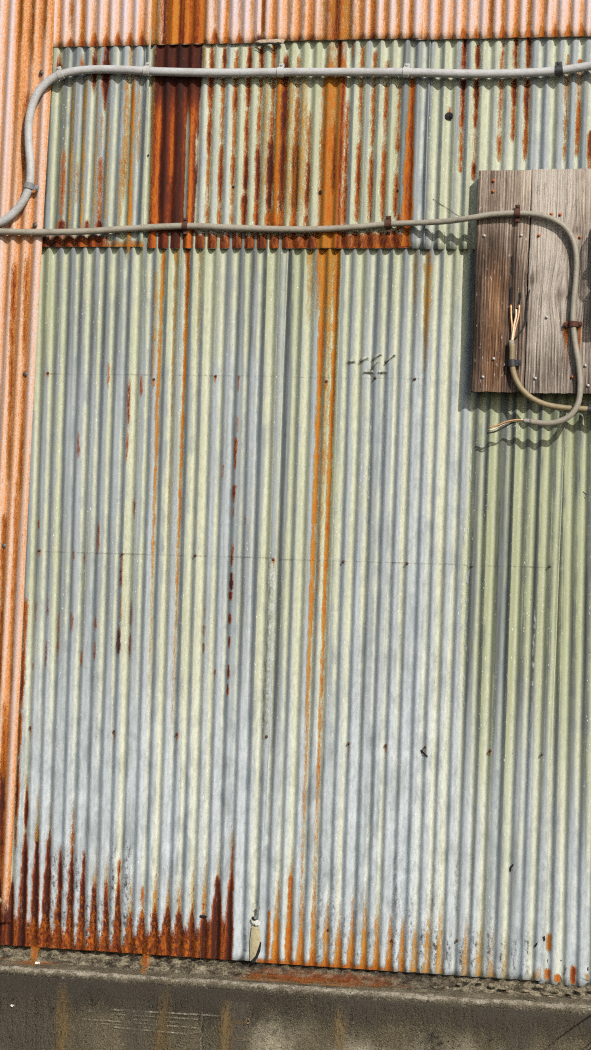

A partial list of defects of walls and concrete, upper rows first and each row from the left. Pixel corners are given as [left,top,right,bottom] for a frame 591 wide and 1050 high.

corrosion [20,0,47,58]
corrosion [459,0,584,180]
corrosion [563,55,591,164]
corrosion [414,250,432,360]
corrosion [42,0,416,844]
corrosion [0,264,234,973]
corrosion [244,846,443,987]
corrosion [462,936,507,977]
corrosion [533,966,589,984]